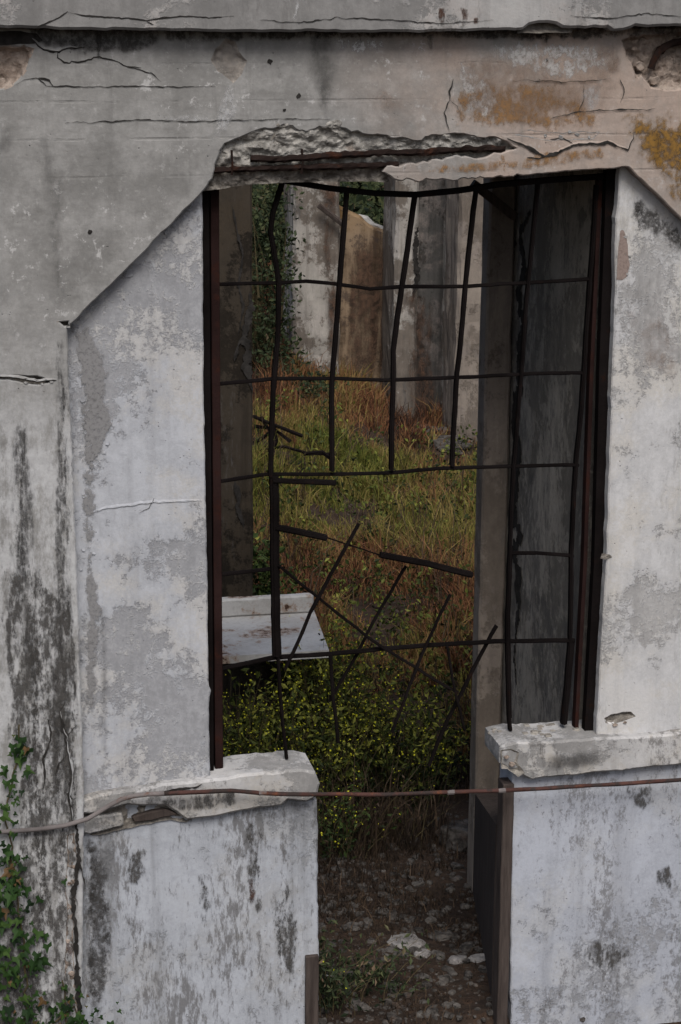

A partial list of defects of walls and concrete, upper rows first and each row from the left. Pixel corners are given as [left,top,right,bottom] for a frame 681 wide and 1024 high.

spalling [0,31,42,90]
crack [18,11,227,88]
spalling [621,32,681,91]
crack [67,116,326,124]
crack [444,81,460,129]
crack [507,78,651,159]
spalling [163,109,514,235]
crack [0,374,57,383]
leakage [0,428,77,1024]
spalling [604,712,636,727]
spalling [500,749,524,777]
crack [42,702,85,1023]